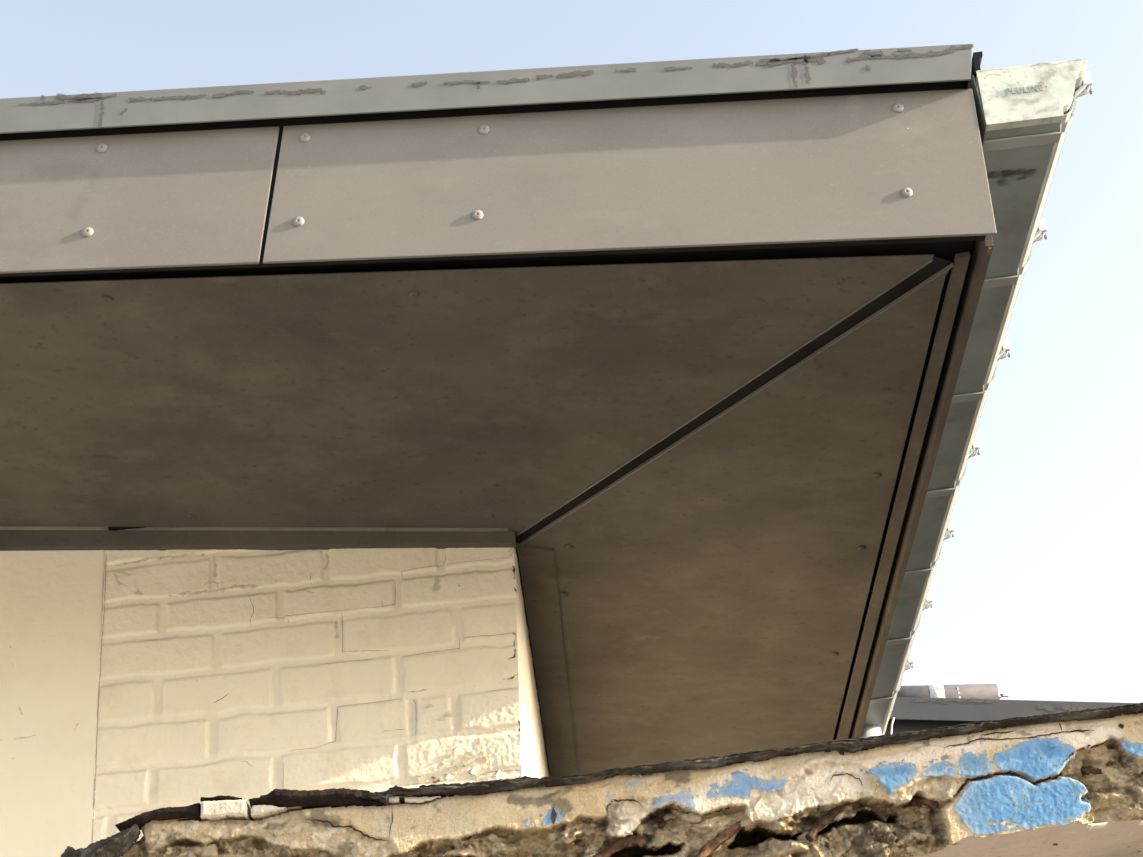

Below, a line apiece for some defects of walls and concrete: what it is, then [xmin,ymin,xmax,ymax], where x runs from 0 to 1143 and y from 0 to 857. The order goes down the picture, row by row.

spalling [120,723,1143,857]
crack [943,723,1113,793]